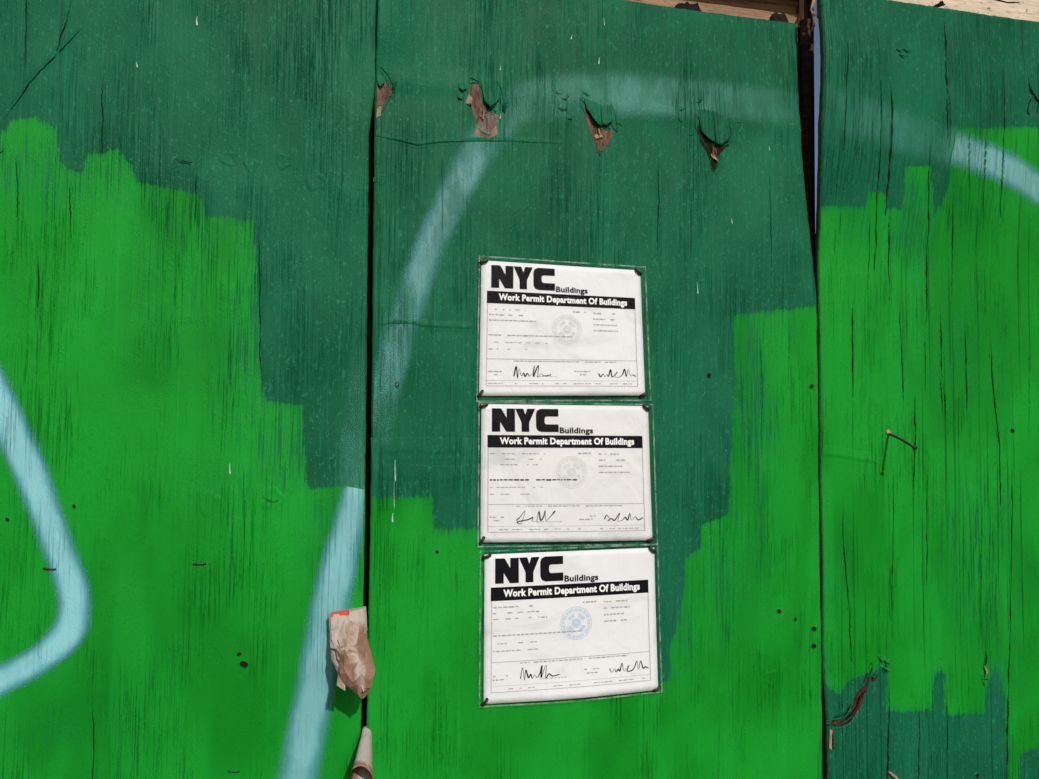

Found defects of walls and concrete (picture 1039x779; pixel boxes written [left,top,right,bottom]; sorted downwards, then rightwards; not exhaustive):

peeling [376,67,398,118]
peeling [457,78,508,138]
peeling [556,90,623,155]
peeling [678,98,741,172]
crack [842,31,850,163]
crack [850,12,1039,779]
crack [826,493,891,779]